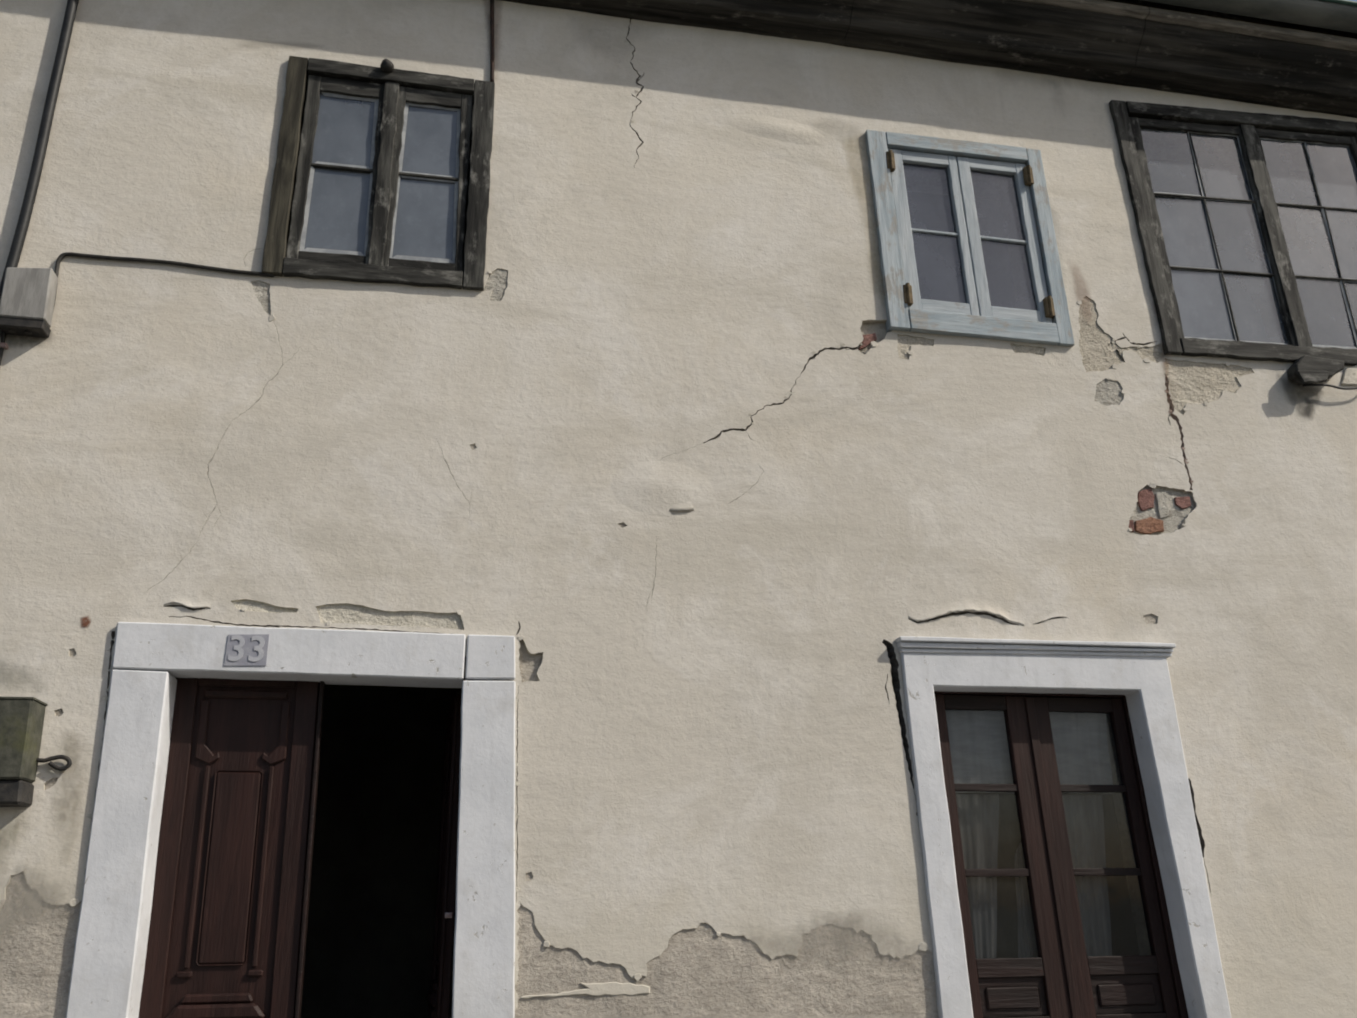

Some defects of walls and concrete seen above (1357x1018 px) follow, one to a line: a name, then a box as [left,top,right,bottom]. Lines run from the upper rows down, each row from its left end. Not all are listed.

crack [623,20,644,168]
crack [1109,334,1157,362]
spalling [1077,296,1253,415]
crack [656,343,862,504]
crack [1165,374,1194,490]
spalling [1128,483,1195,535]
spalling [231,600,298,613]
spalling [316,604,464,630]
spalling [518,635,543,683]
crack [882,639,918,816]
spalling [0,871,82,1018]
spalling [515,903,939,1018]